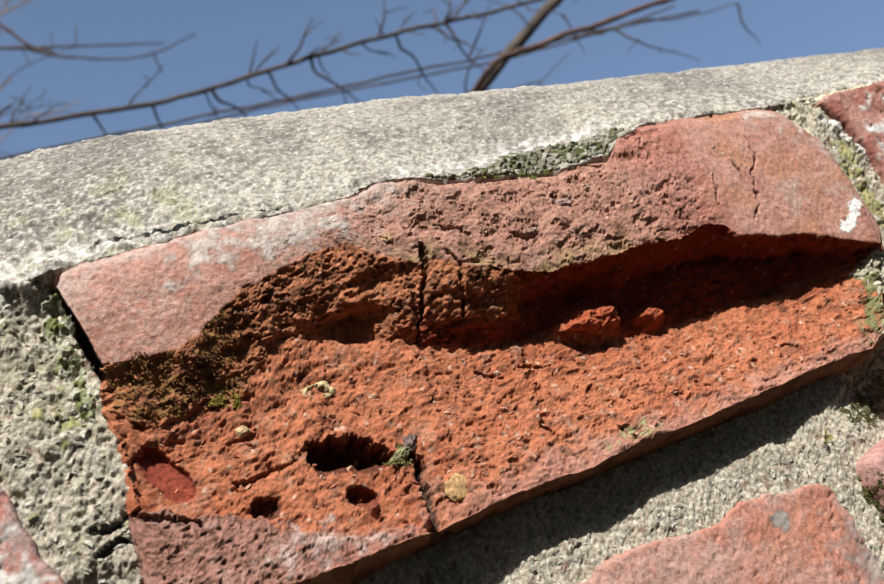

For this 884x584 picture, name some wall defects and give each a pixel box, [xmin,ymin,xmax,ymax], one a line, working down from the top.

damp [866,123,884,150]
crack [747,139,762,214]
damp [839,198,863,233]
crack [415,242,467,342]
spalling [102,224,884,542]